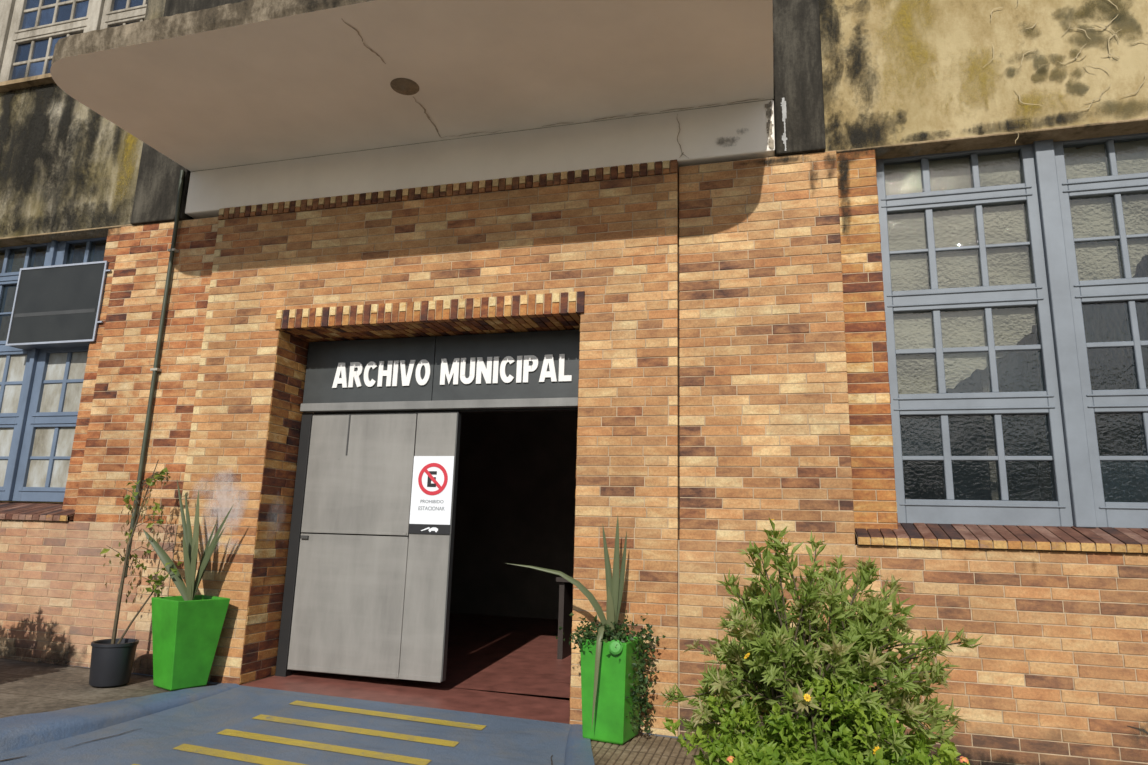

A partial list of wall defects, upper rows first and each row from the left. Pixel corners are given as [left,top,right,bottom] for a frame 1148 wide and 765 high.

crack [342,19,386,64]
leakage [819,0,874,100]
leakage [0,68,132,237]
leakage [113,126,136,185]
leakage [811,112,905,232]
leakage [907,132,941,141]
leakage [973,113,1078,134]
leakage [1103,102,1147,115]